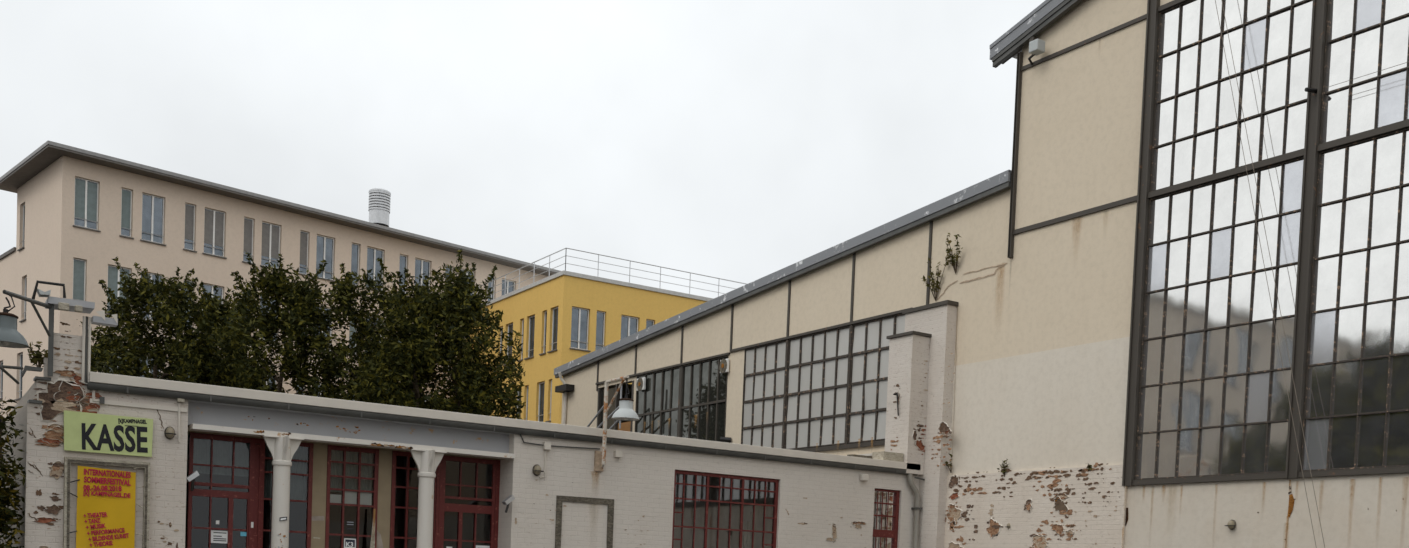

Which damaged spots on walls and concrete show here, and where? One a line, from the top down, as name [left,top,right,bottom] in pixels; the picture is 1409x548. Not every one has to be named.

flaking render [33,319,102,525]
peeling [890,353,1119,548]